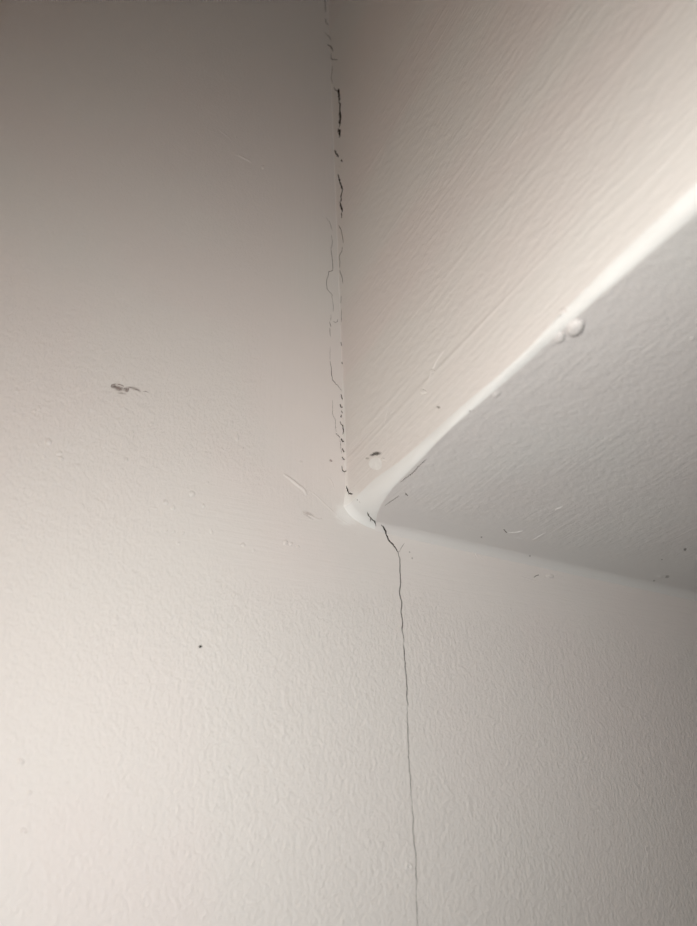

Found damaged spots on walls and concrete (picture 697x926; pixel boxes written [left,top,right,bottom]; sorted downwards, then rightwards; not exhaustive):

crack [325,4,422,926]